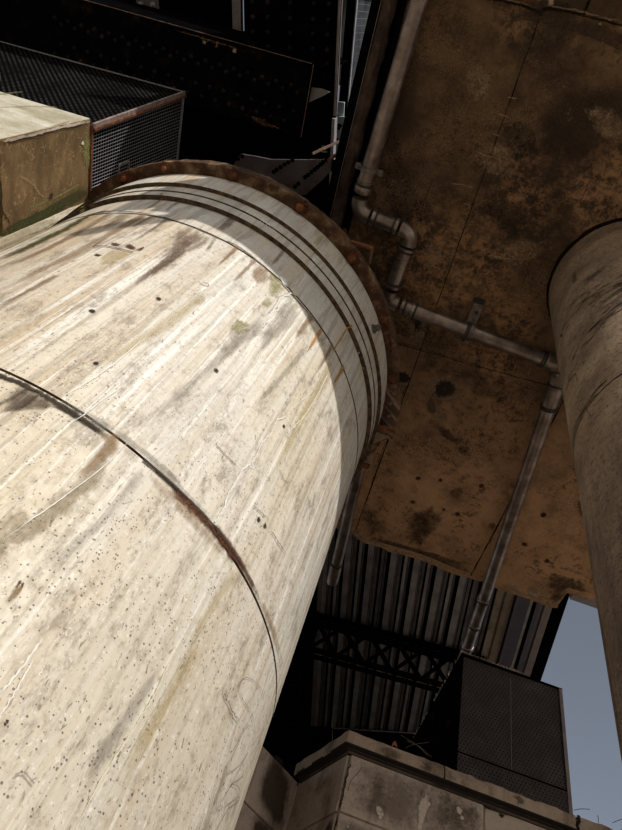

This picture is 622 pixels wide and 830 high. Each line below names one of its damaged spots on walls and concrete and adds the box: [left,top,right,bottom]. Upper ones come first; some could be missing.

crack [493,0,622,26]
leakage [254,760,297,830]
crack [334,764,351,829]